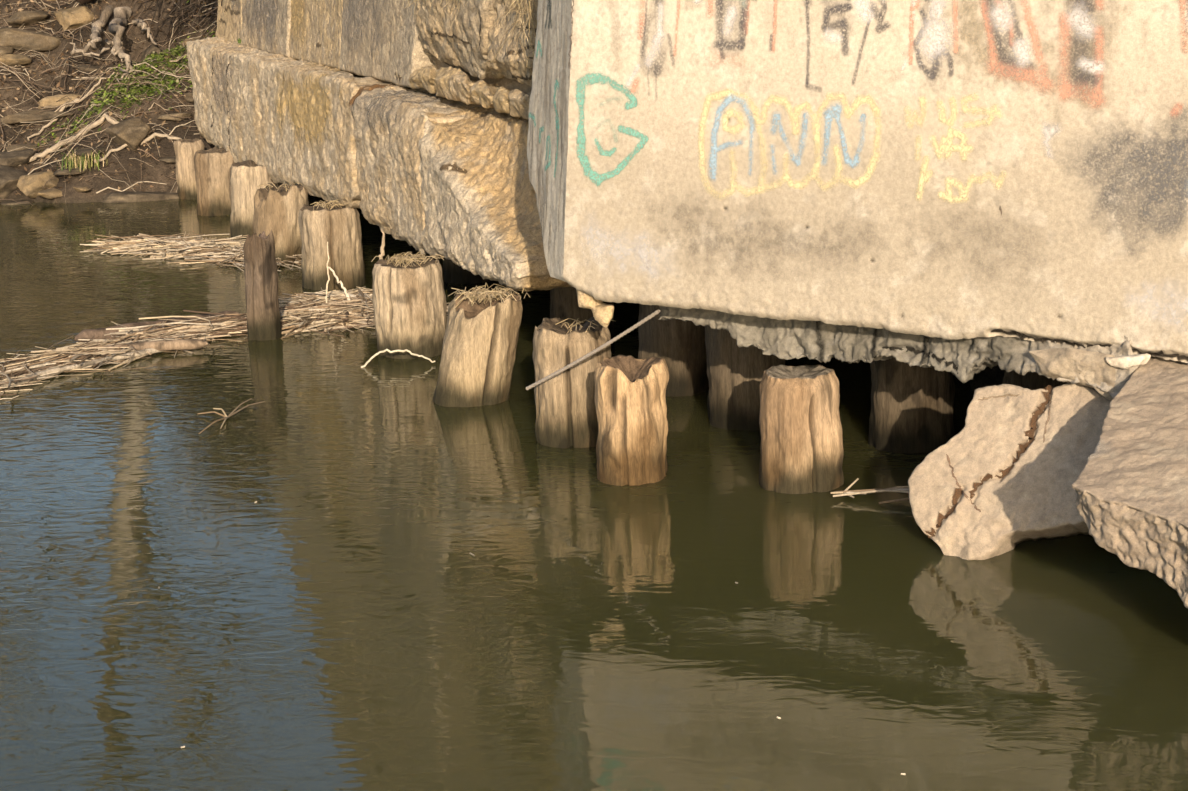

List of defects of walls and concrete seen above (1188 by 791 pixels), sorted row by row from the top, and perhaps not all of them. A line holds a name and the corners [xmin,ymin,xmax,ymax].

spalling [1028,348,1151,400]